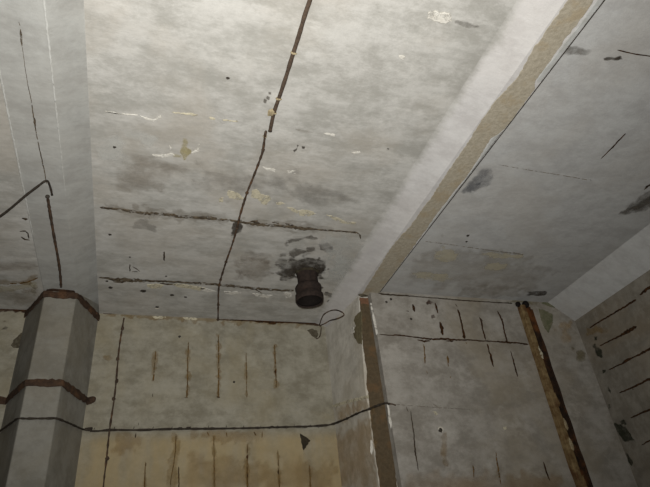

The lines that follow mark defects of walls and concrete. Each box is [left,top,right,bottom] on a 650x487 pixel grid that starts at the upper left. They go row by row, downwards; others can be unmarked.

spalling [427,10,452,24]
peeling [537,0,604,83]
rust [590,286,650,328]
leakage [614,420,634,442]